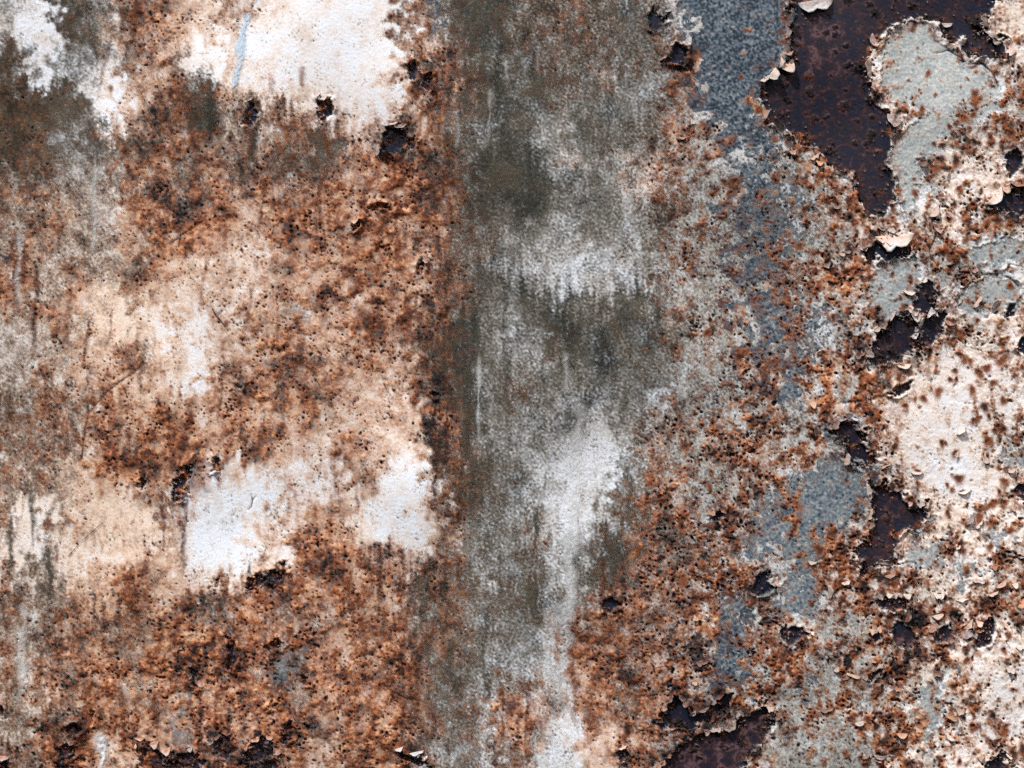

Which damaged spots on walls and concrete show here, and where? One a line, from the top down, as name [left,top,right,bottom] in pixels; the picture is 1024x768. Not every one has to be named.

peeling [648,8,672,35]
peeling [375,121,415,160]
peeling [760,0,1017,218]
peeling [865,278,947,368]
rust [0,0,473,768]
leakage [388,0,716,768]
rust [486,0,1024,768]
peeling [888,378,912,397]
peeling [848,479,929,577]
peeling [653,693,782,768]